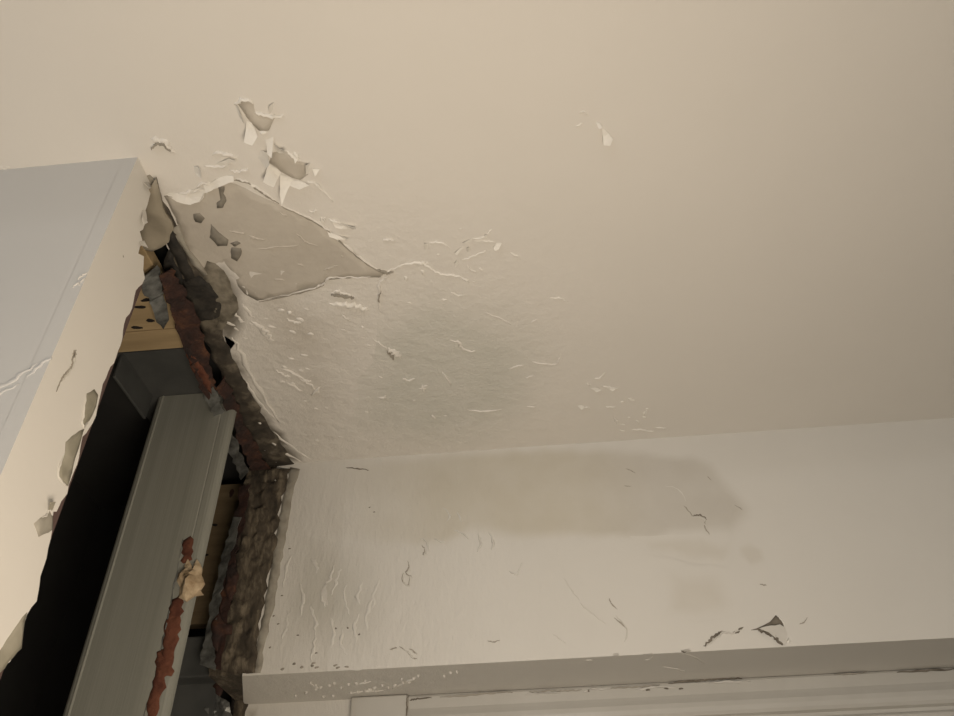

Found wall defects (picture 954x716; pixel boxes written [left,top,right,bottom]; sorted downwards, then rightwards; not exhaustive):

crack [377,261,469,311]
spalling [57,389,98,486]
peeling [160,97,383,716]
damp [164,249,766,671]
spalling [34,502,56,537]
rust [181,536,194,564]
rust [146,596,184,716]
crack [705,627,743,648]